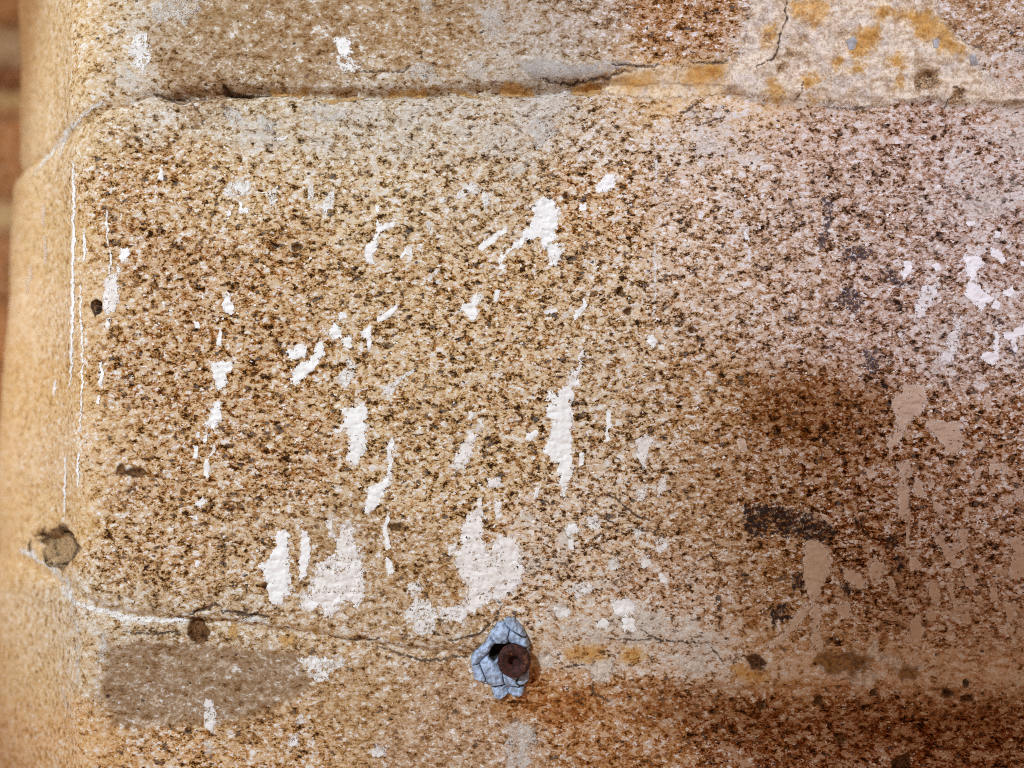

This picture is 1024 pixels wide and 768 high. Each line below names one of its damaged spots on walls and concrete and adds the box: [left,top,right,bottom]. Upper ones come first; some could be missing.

crack [756,0,788,67]
spalling [34,523,82,571]
crack [334,605,502,662]
crack [609,629,724,662]